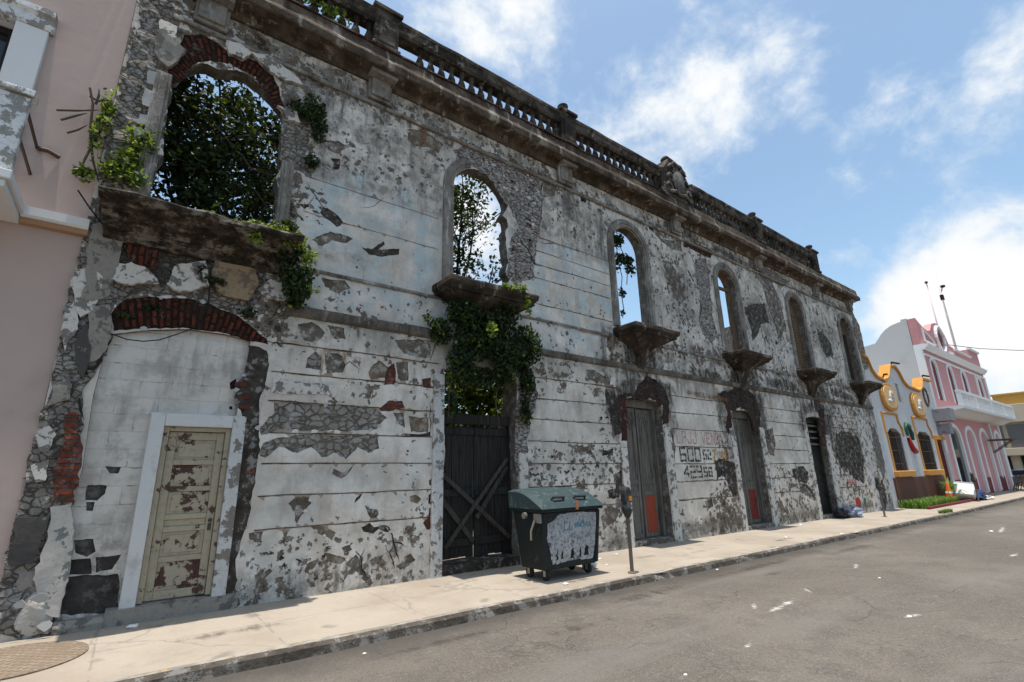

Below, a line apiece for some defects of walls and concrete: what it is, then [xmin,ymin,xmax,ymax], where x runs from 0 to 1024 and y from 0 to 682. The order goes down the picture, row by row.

flaking render [406,129,556,285]
flaking render [111,243,270,315]
flaking render [52,407,86,503]
flaking render [255,338,431,478]
water stain [693,368,796,447]